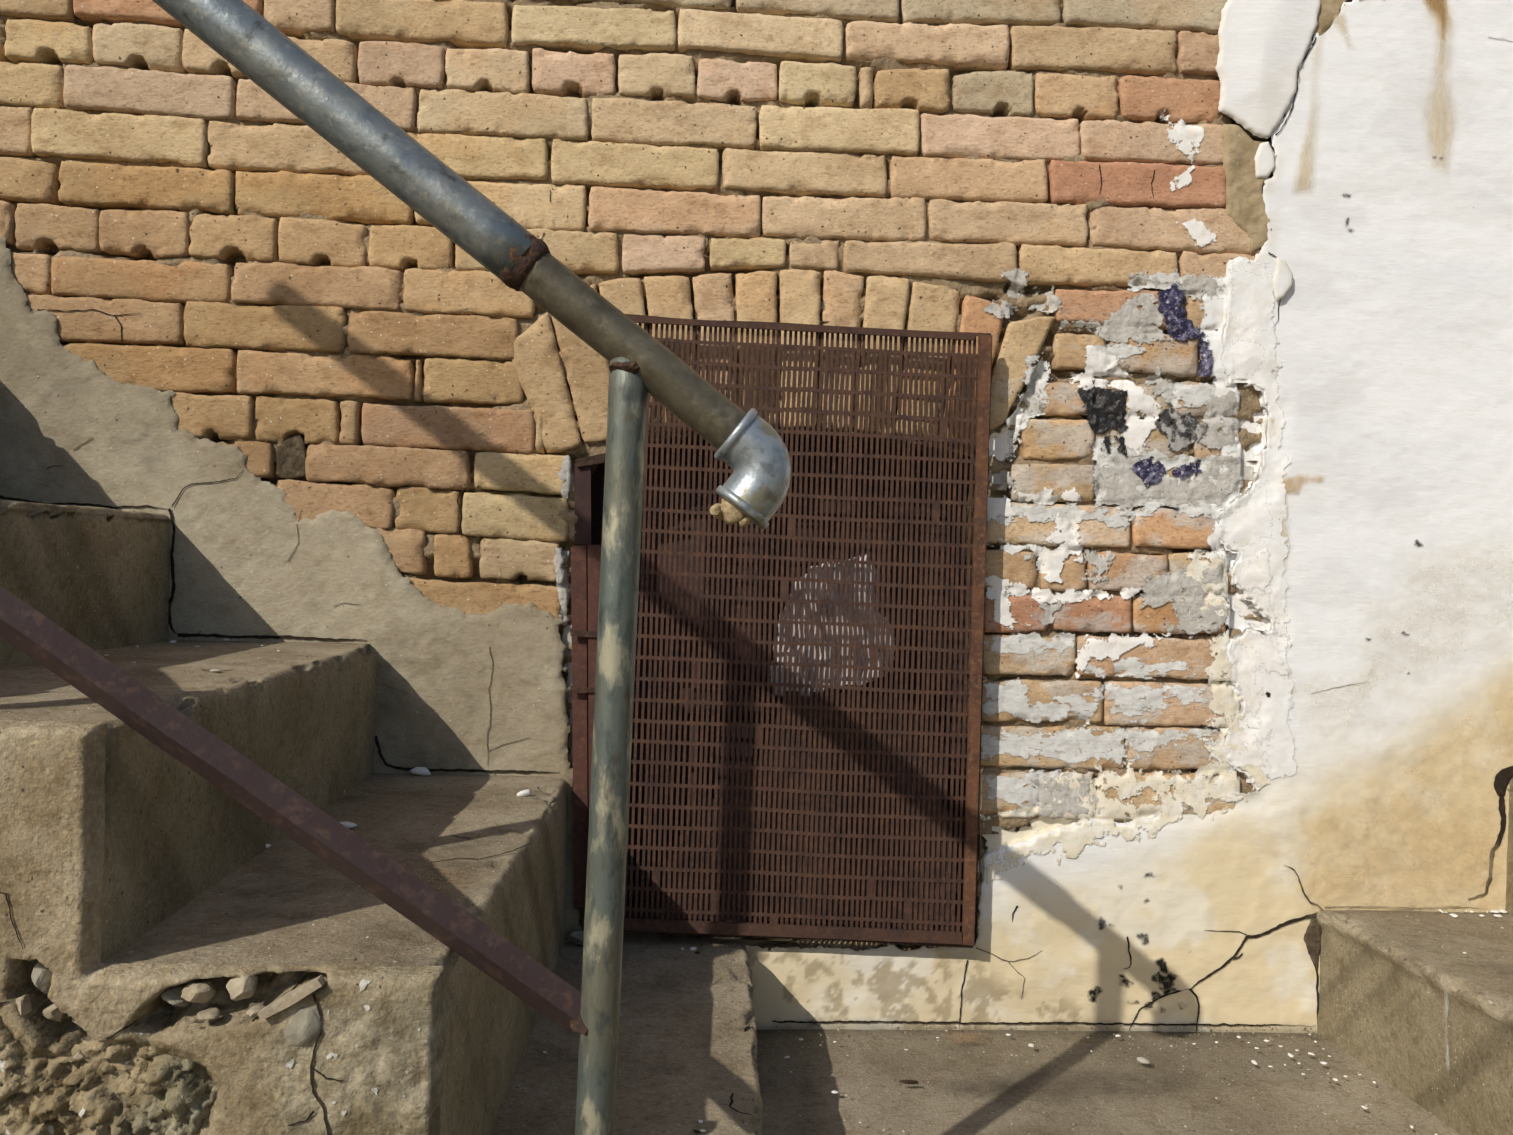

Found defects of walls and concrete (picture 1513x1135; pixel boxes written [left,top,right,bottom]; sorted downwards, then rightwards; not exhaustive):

water stain [1299,143,1310,189]
crack [0,437,368,671]
spalling [275,434,306,479]
peeling [977,109,1298,885]
crack [0,892,23,948]
spalling [0,959,328,1135]
crack [287,973,344,1135]
crack [772,796,1506,1032]
water stain [1120,958,1182,1010]